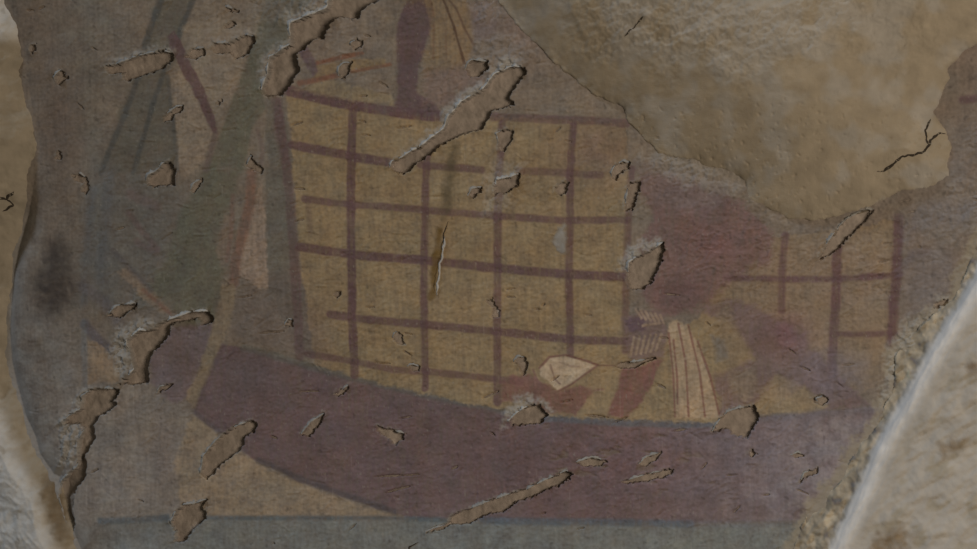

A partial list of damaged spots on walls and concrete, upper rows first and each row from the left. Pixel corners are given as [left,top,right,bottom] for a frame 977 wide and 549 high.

flaking render [187,4,256,60]
flaking render [260,0,379,96]
flaking render [465,58,489,77]
crack [877,119,945,172]
flaking render [145,162,176,187]
flaking render [820,207,873,259]
flaking render [625,242,666,289]
flaking render [59,309,214,521]
flaking render [507,405,549,425]
flaking render [712,405,760,437]
flaking render [198,421,258,477]
flaking render [169,499,207,541]